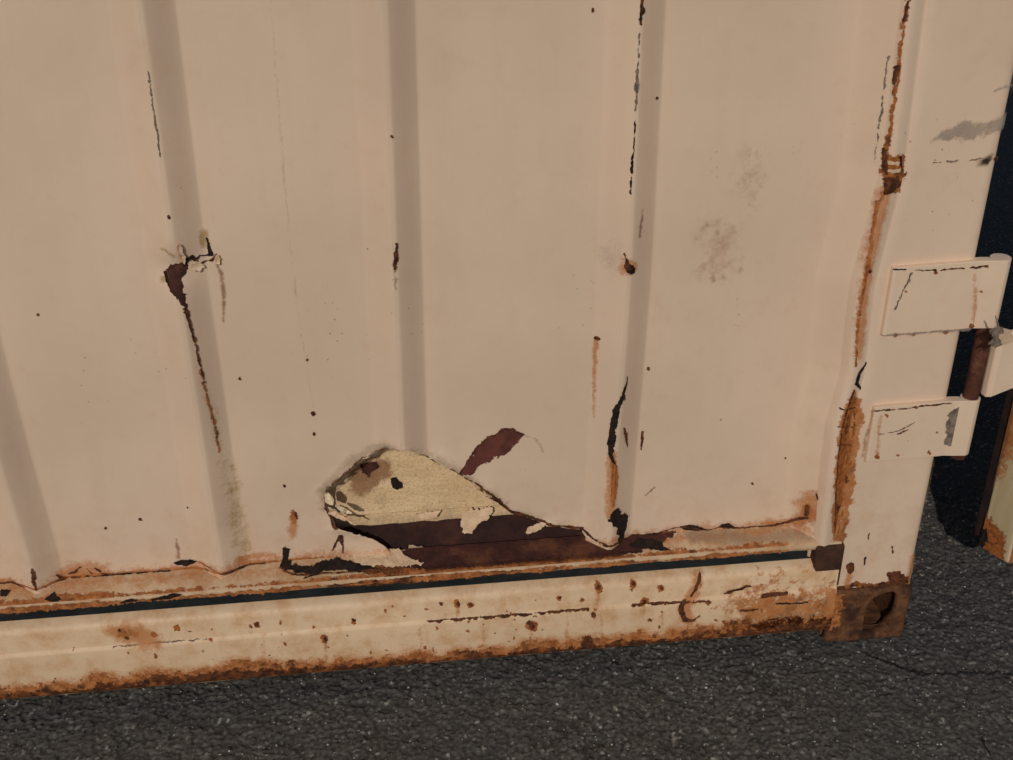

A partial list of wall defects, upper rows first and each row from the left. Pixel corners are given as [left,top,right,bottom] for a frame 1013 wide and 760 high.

corrosion [831,0,911,543]
corrosion [166,262,220,452]
peeling [324,493,353,524]
peeling [352,545,424,568]
corrosion [0,448,818,614]
peeling [414,510,441,520]
peeling [459,428,525,534]
peeling [526,523,545,534]
corrosion [979,514,1013,564]
corrosion [994,404,1013,481]
corrosion [0,557,914,699]